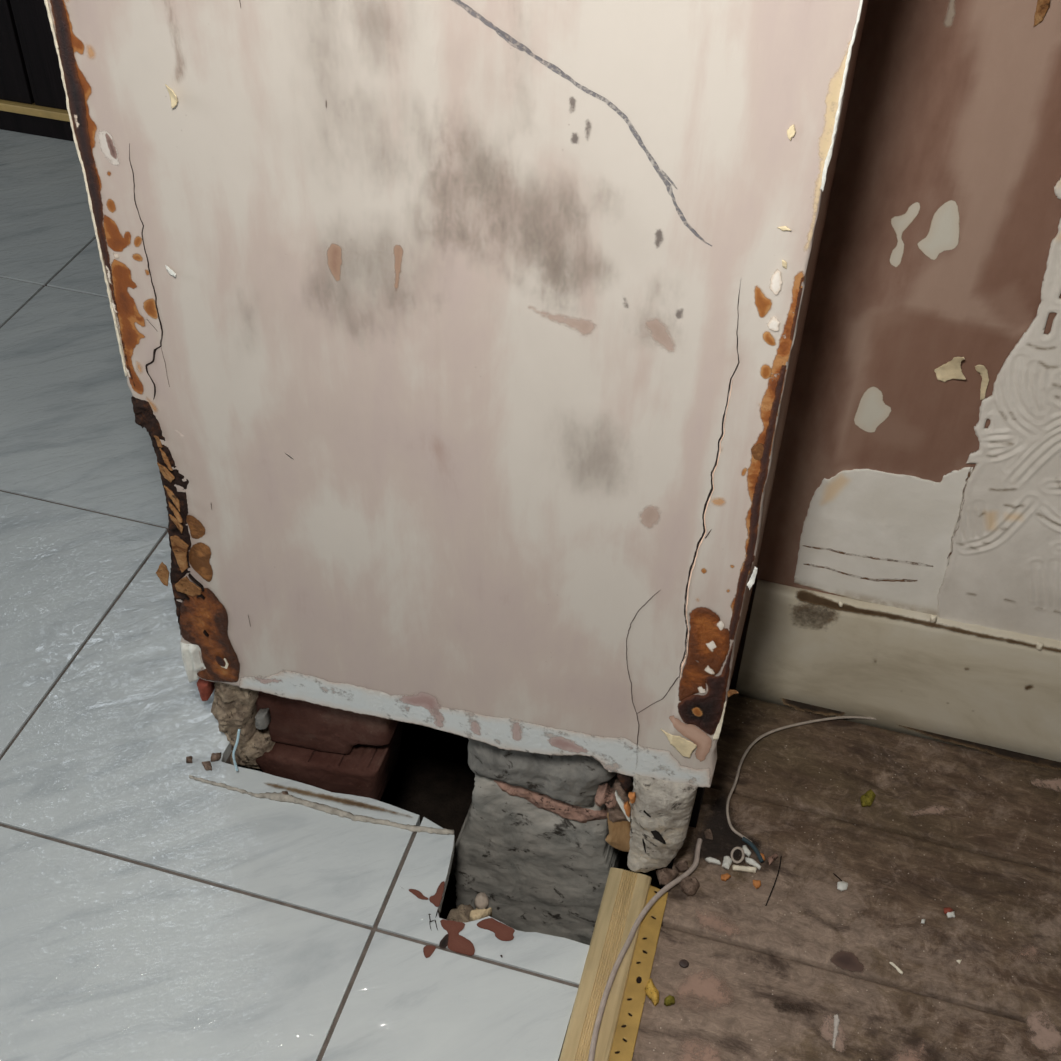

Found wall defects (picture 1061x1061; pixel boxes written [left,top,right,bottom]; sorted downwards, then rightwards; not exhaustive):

corrosion [50,0,158,410]
crack [129,143,170,400]
corrosion [154,435,240,683]
crack [626,282,741,770]
corrosion [678,272,805,735]
peeling [805,0,863,249]
peeling [854,387,891,433]
peeling [890,202,920,267]
peeling [917,200,960,260]
peeling [934,357,989,400]
peeling [1033,0,1050,27]
spalling [197,670,726,958]